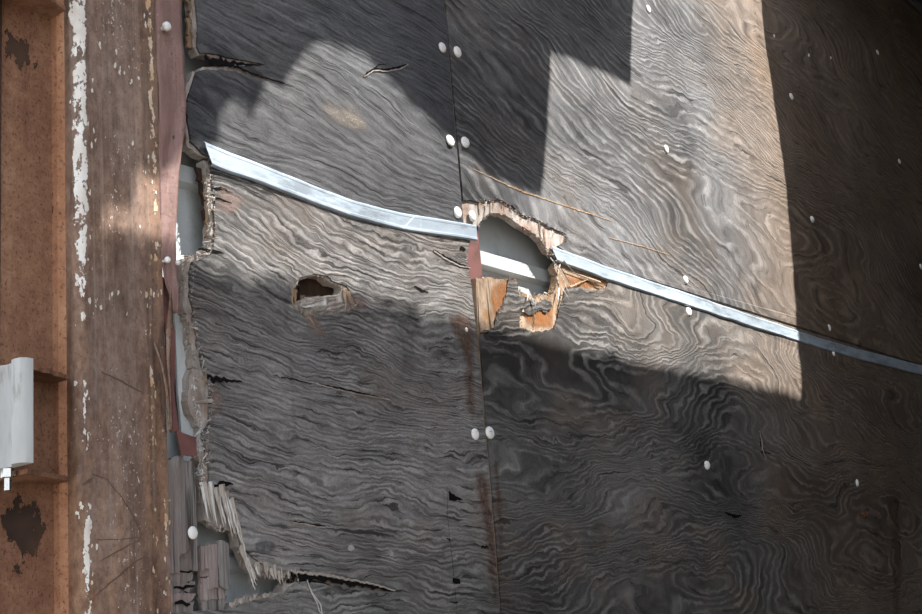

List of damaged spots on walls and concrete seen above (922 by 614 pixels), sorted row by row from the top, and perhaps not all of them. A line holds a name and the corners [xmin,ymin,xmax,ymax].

peeling [68,0,119,321]
peeling [114,0,160,216]
crack [204,54,294,87]
crack [364,64,408,77]
spalling [291,274,358,323]
spalling [476,197,608,335]
spalling [198,481,300,609]
crack [291,569,408,593]